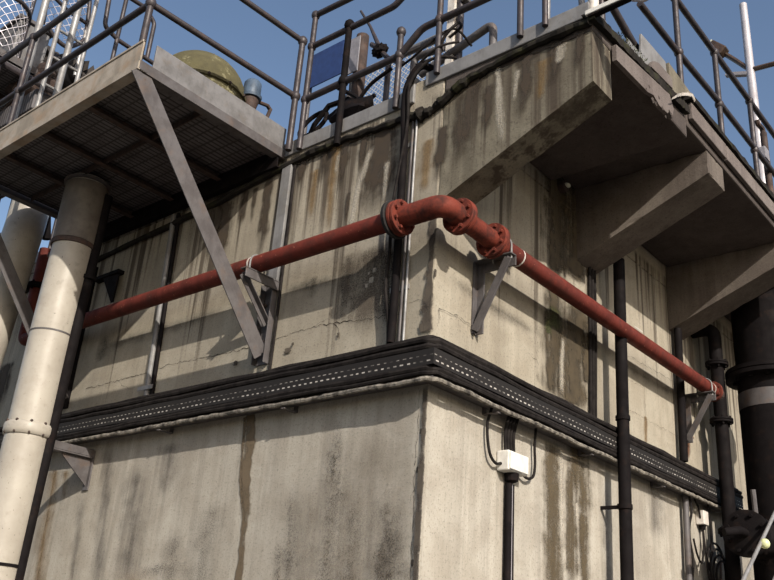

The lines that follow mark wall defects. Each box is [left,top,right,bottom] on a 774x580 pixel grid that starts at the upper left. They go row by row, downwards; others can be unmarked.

damp [514,51,539,110]
damp [433,70,503,172]
damp [210,179,273,249]
crack [277,300,416,339]
damp [341,246,393,322]
damp [0,363,13,399]
damp [560,305,589,407]
damp [375,508,400,580]
damp [560,447,591,580]